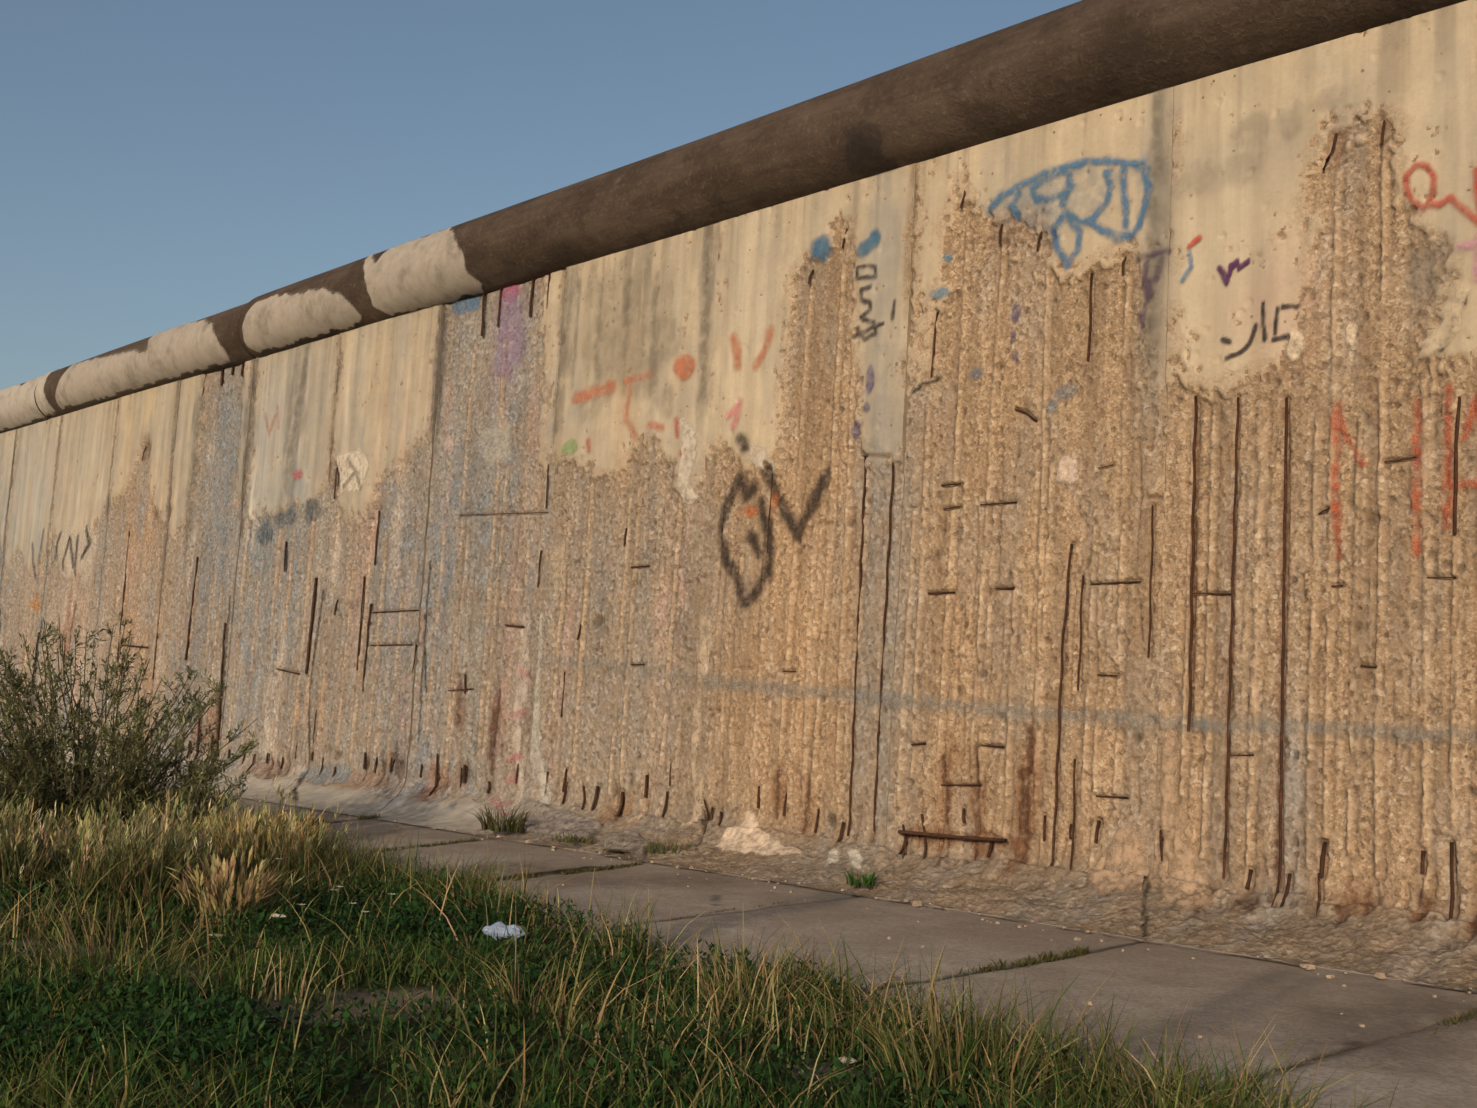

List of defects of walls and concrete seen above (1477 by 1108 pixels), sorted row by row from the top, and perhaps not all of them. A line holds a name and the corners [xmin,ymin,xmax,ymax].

peeling [0,369,63,453]
spalling [0,520,53,742]
spalling [44,100,1477,993]
rust [1019,728,1033,863]